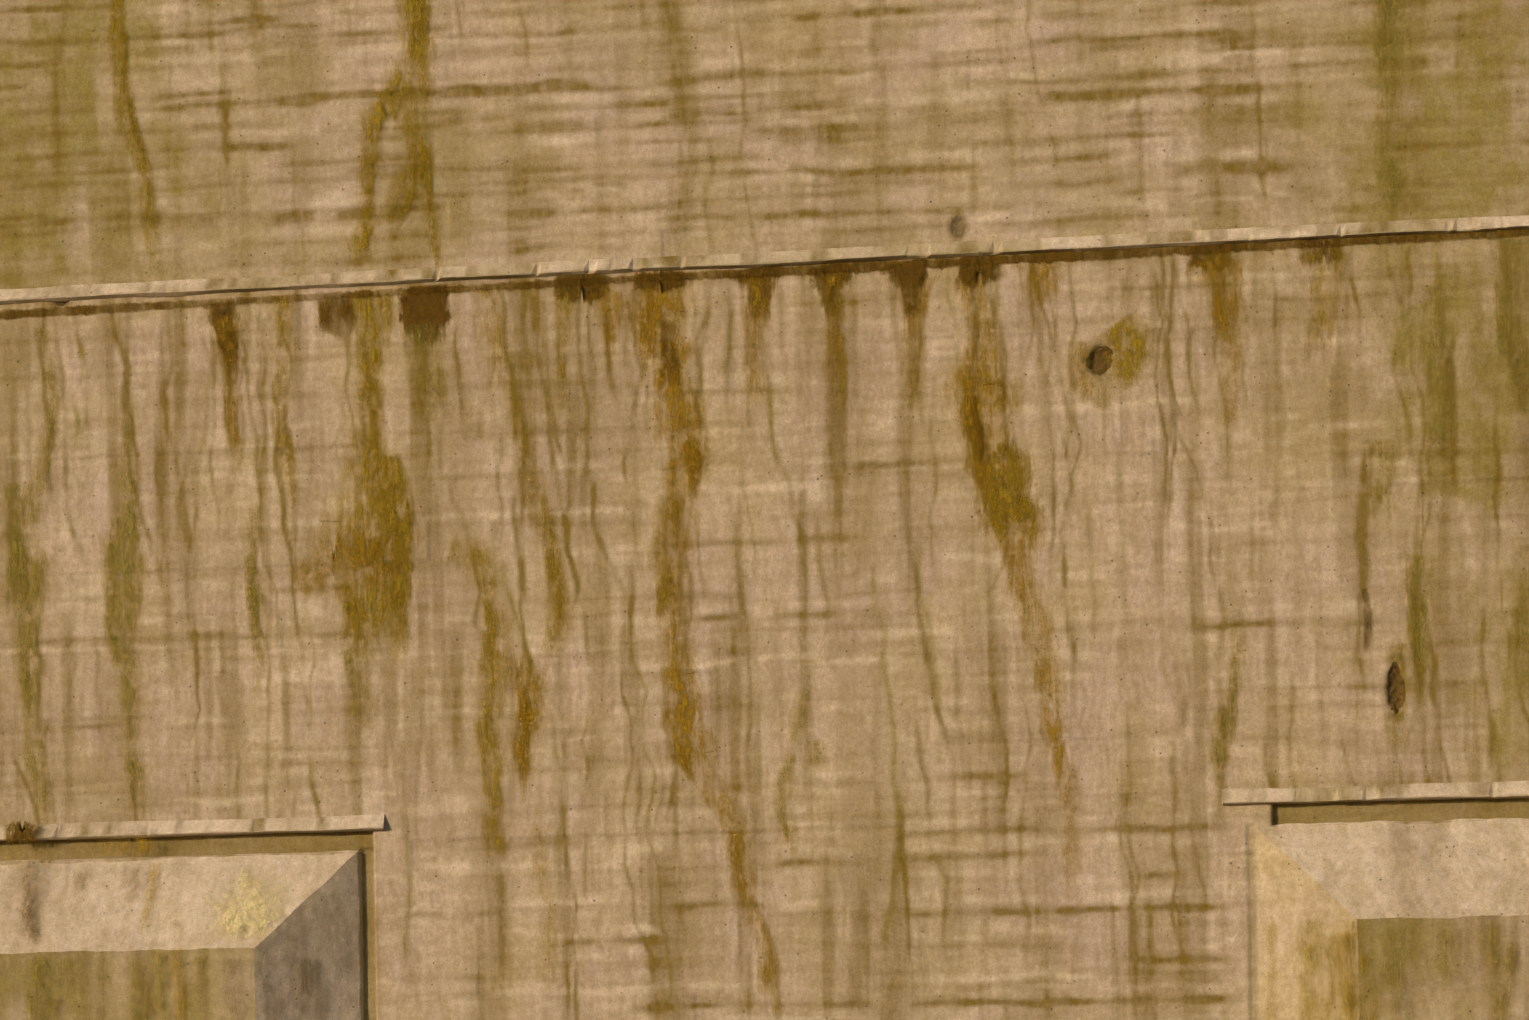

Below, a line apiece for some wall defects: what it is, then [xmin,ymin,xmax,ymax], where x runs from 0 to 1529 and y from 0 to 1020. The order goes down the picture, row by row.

damp [354,0,432,250]
damp [735,266,776,326]
damp [807,262,850,313]
damp [889,258,926,329]